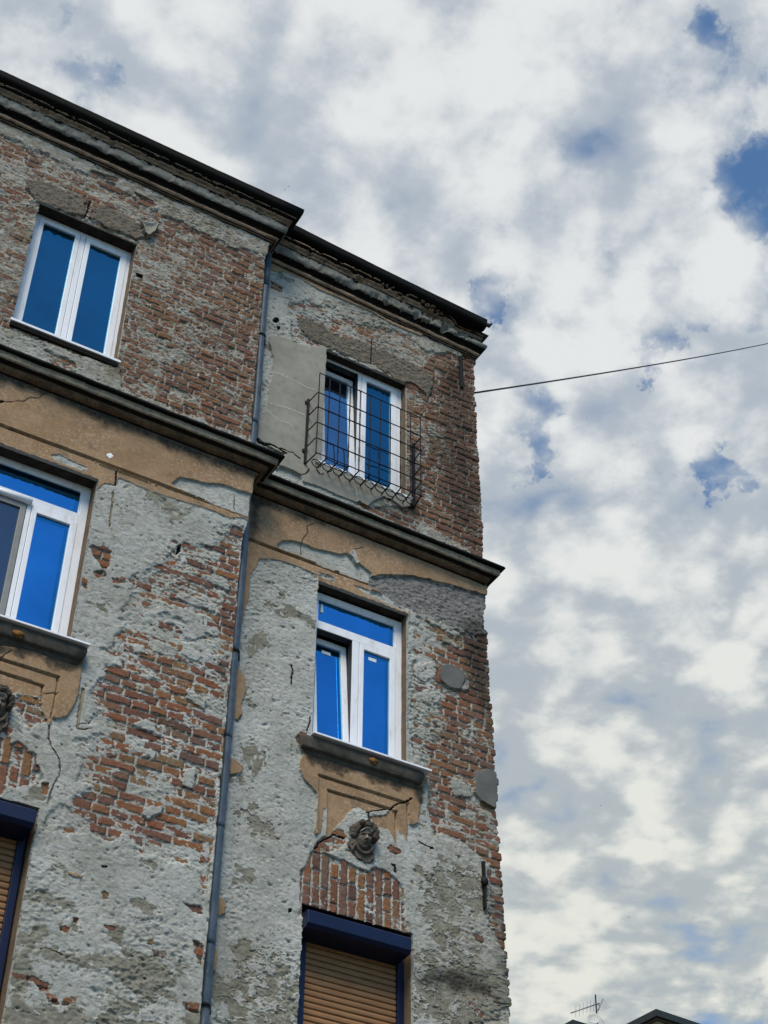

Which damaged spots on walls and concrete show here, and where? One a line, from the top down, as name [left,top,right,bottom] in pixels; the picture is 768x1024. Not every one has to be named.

flaking render [0,134,484,557]
crack [48,724,62,791]
flaking render [0,524,281,914]
crack [367,797,413,819]
flaking render [277,540,512,1024]